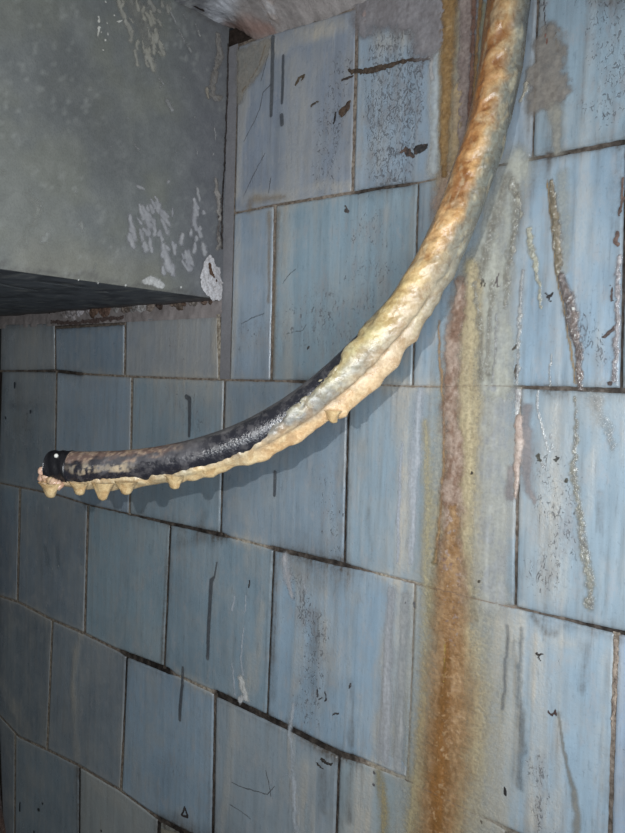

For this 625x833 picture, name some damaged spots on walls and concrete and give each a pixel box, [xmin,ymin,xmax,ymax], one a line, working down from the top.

peeling [49,187,223,326]
leakage [63,0,553,613]
corrosion [402,250,513,833]
corrosion [433,0,486,211]
leakage [547,174,594,610]